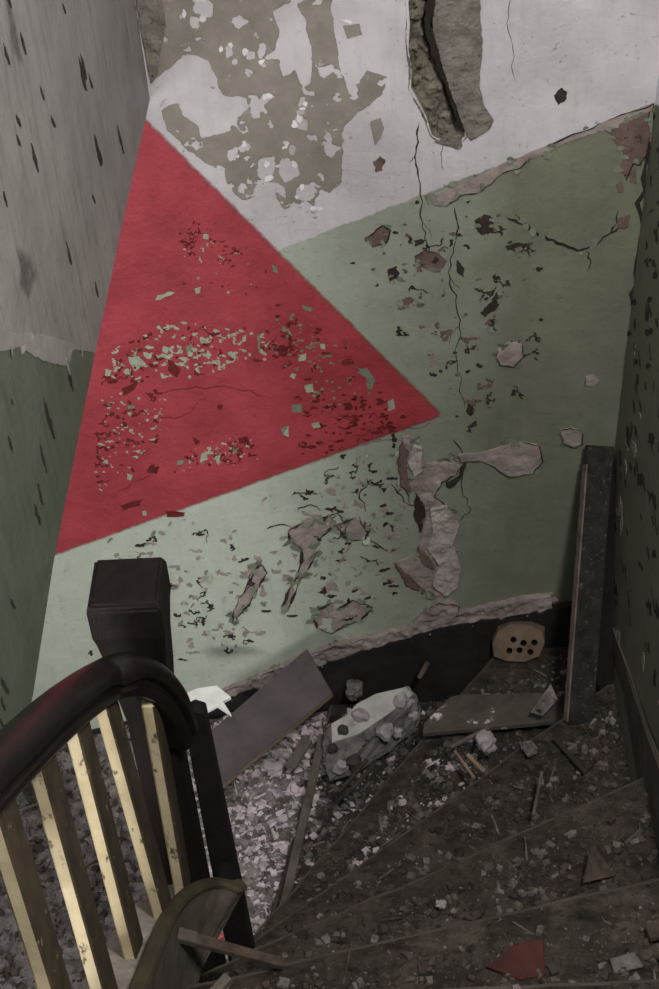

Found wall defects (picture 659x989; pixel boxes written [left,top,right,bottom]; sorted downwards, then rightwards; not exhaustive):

peeling [16,114,39,173]
peeling [0,329,91,391]
peeling [78,53,93,91]
peeling [156,221,249,300]
peeling [136,0,387,219]
crack [410,124,465,405]
peeling [364,223,511,433]
spalling [405,0,494,150]
peeling [465,214,543,281]
peeling [415,103,659,207]
crack [507,112,651,302]
spalling [94,304,559,696]